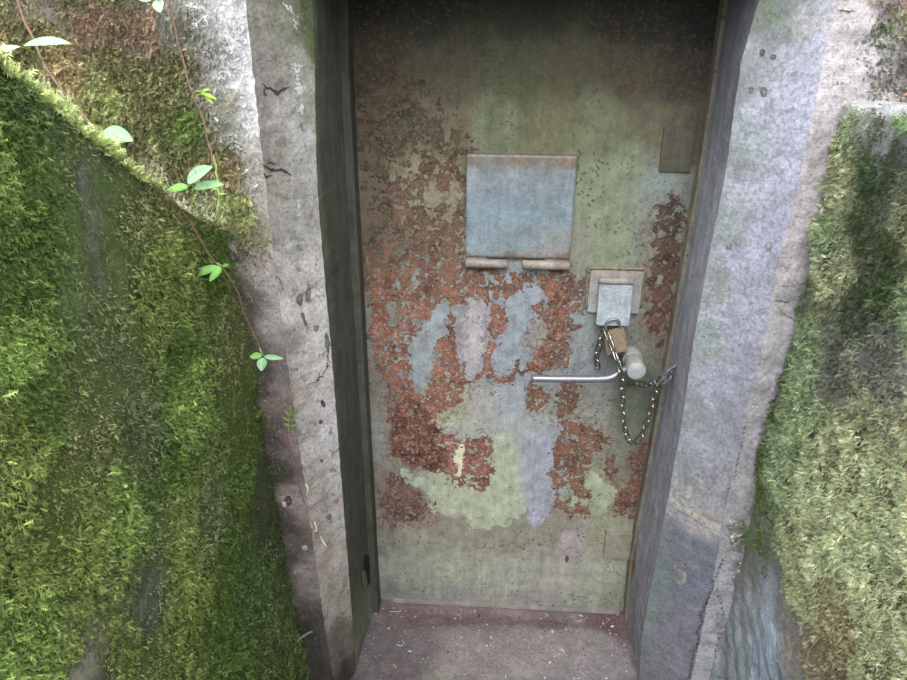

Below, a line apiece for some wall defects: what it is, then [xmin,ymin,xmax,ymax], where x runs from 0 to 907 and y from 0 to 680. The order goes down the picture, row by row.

crack [262,83,289,95]
crack [262,161,291,179]
peeling [405,282,545,395]
corrosion [354,58,648,528]
corrosion [643,191,688,348]
peeling [400,430,556,531]
peeling [570,471,617,515]